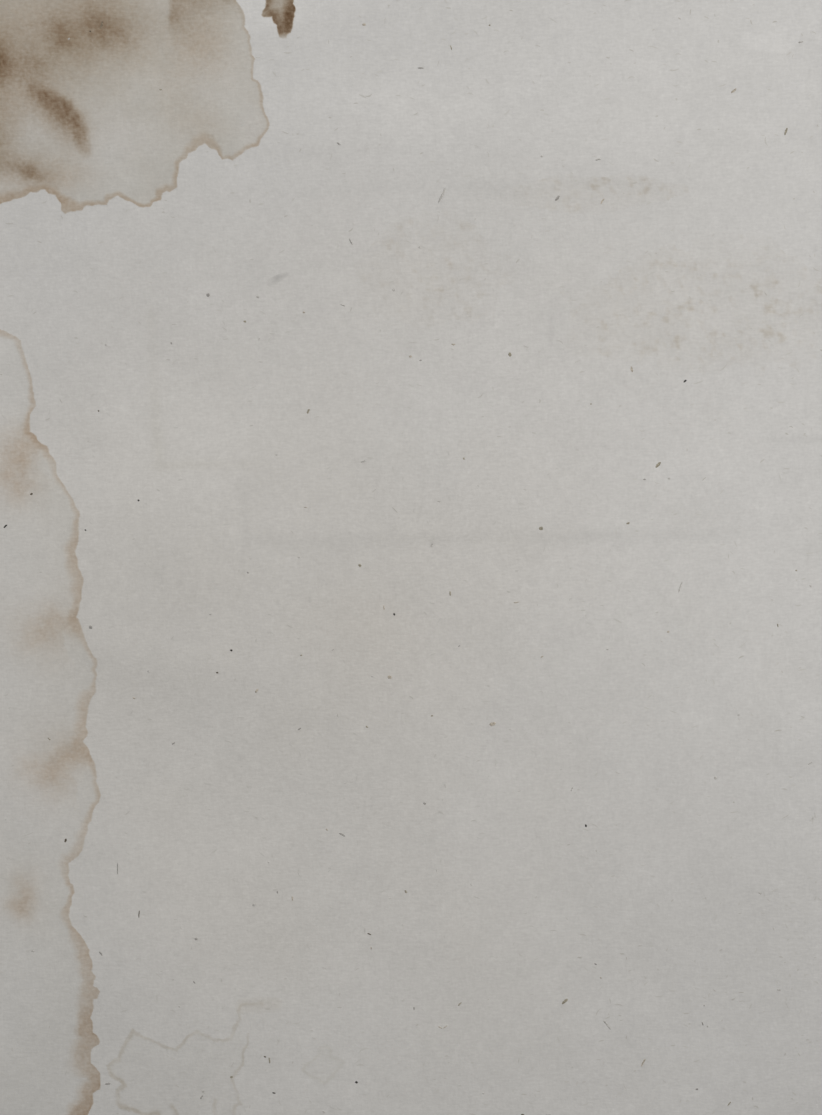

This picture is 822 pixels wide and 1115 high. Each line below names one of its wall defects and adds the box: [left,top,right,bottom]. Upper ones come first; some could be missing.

water stain [0,0,270,214]
water stain [261,0,296,39]
water stain [0,329,283,1115]